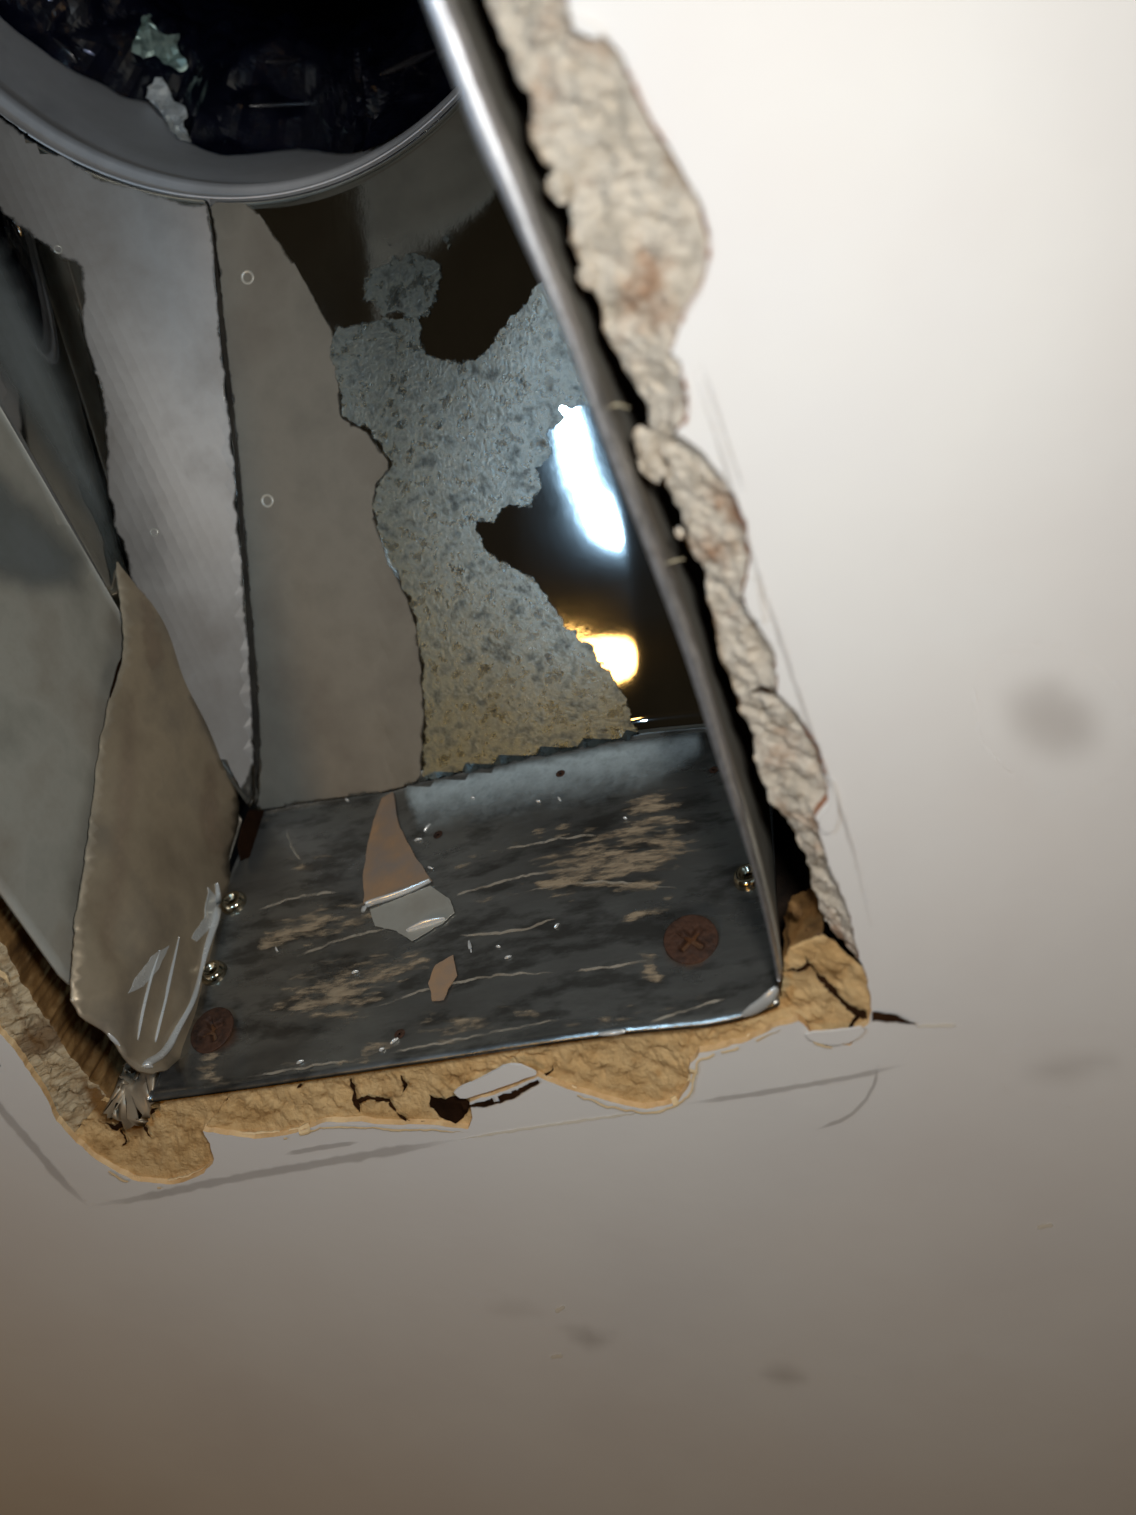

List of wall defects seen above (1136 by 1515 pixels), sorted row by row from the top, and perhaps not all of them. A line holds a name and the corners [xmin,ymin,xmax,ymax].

flaking render [0,0,870,1189]
crack [350,1075,422,1122]
crack [469,1067,554,1108]